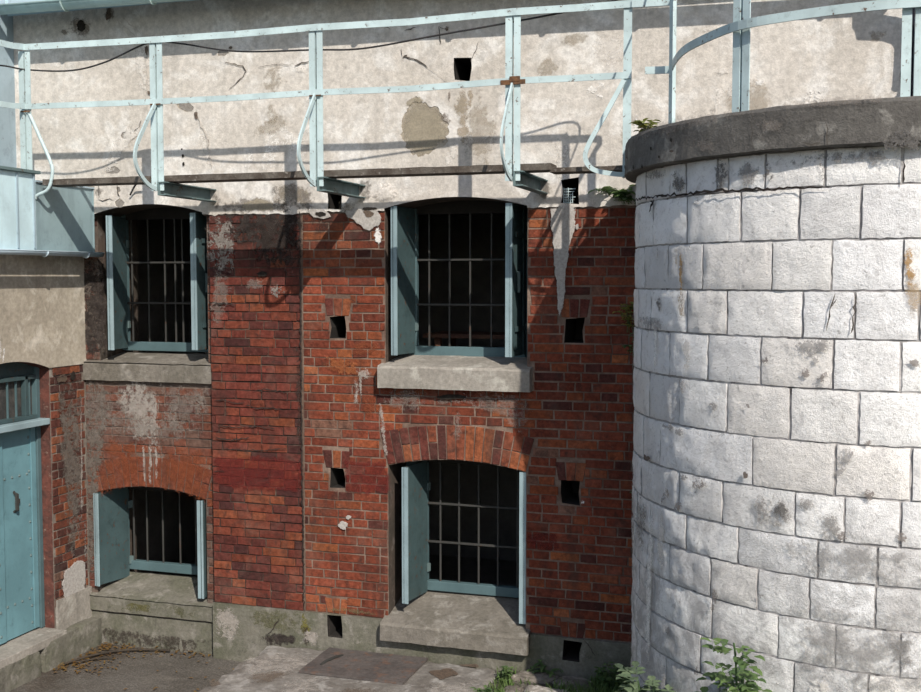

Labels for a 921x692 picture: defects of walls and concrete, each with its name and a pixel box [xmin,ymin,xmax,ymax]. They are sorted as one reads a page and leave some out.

crack [225,61,309,87]
crack [387,27,446,81]
peeling [403,97,450,156]
leakage [445,91,473,165]
peeling [345,207,382,243]
crack [633,186,832,225]
rust [904,248,921,309]
crack [826,293,857,334]
peeling [62,524,87,597]